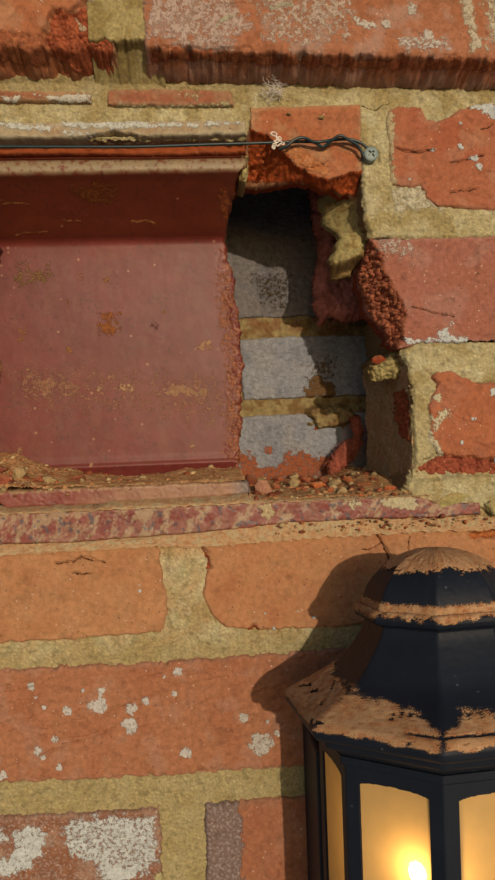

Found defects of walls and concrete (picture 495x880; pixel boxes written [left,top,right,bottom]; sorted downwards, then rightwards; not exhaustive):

spalling [0,8,114,76]
spalling [224,128,363,256]
spalling [357,238,407,350]
spalling [418,455,495,475]
crack [363,534,411,558]
leakage [0,825,48,877]
leakage [60,812,164,880]